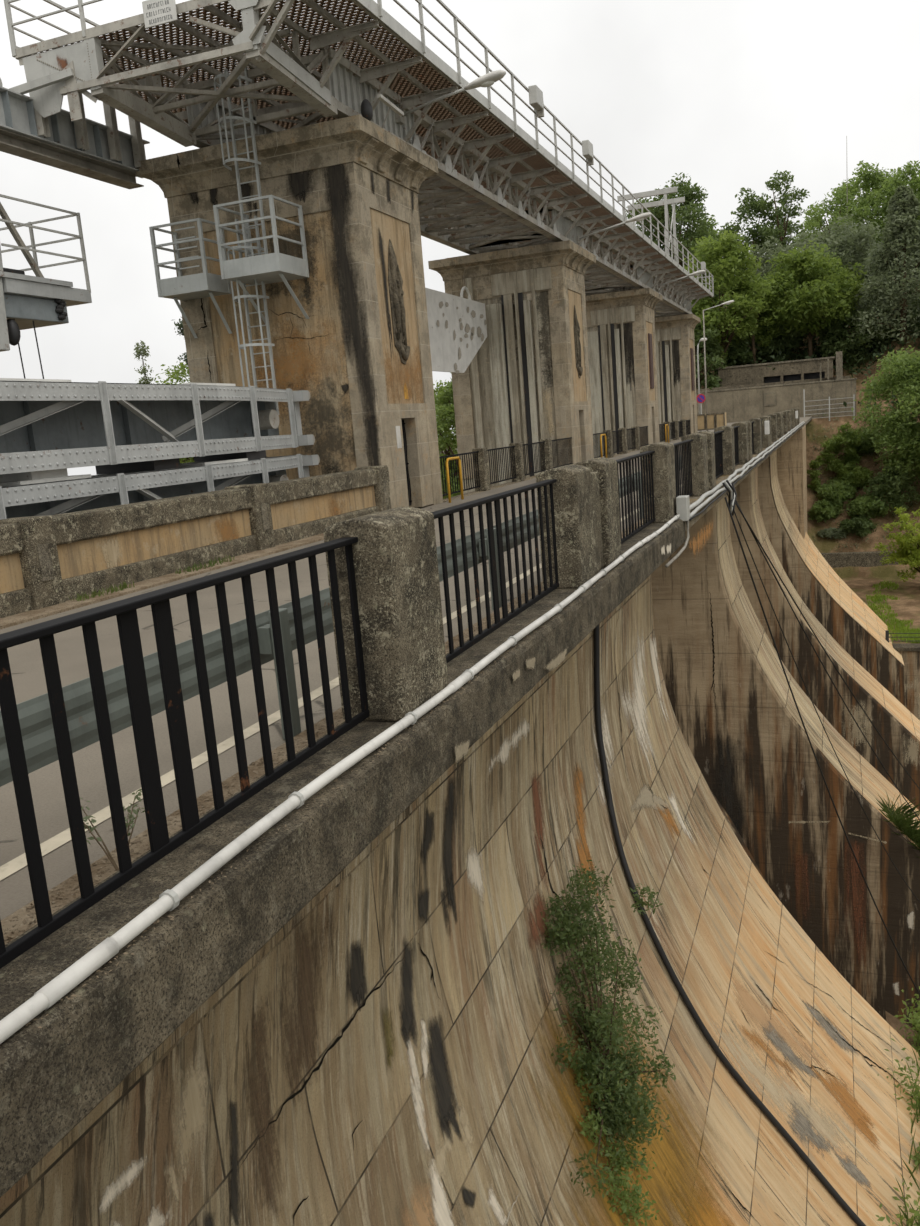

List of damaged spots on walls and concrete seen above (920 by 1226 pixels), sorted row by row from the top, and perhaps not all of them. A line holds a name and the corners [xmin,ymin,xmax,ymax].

leakage [267,164,379,474]
leakage [378,229,393,358]
leakage [499,291,554,433]
leakage [711,735,749,847]
leakage [849,704,872,746]
leakage [902,740,919,767]
leakage [348,944,367,1008]
crack [239,943,441,1168]
leakage [400,942,472,1226]
leakage [99,1160,143,1211]
leakage [148,1209,165,1226]
leakage [488,1190,506,1225]